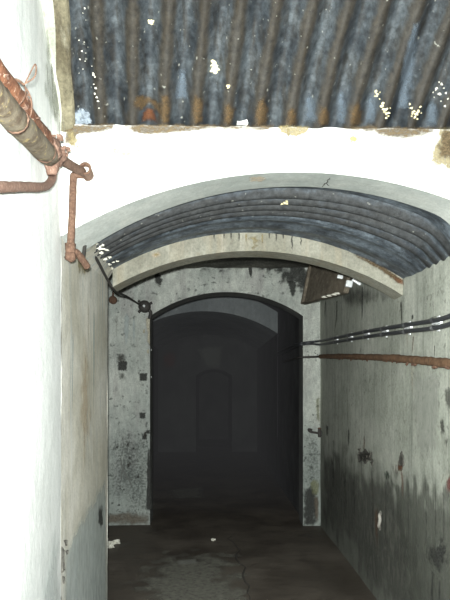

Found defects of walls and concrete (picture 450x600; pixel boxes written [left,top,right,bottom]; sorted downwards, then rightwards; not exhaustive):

corrosion [134,96,169,123]
corrosion [193,96,203,123]
corrosion [279,109,308,137]
corrosion [318,108,329,125]
water stain [350,126,450,169]
water stain [261,267,307,296]
spalling [358,439,374,466]
water stain [115,430,152,510]
water stain [325,455,450,600]